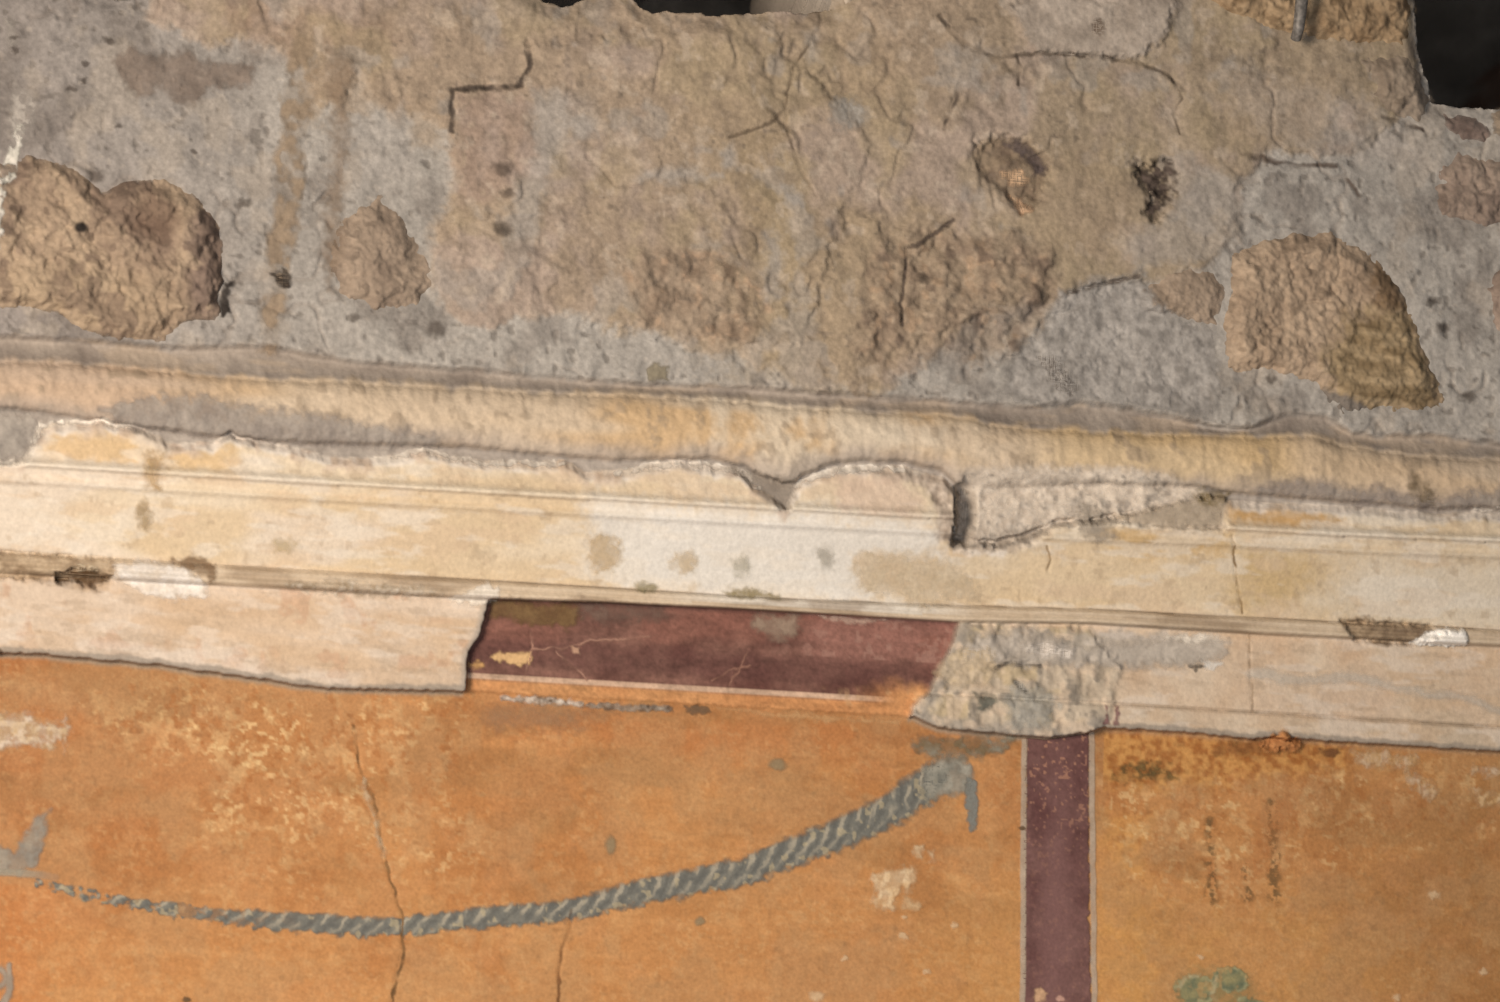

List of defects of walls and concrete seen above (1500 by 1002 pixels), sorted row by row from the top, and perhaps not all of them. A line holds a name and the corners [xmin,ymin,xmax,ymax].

crack [449,54,532,133]
crack [1013,52,1173,85]
spalling [979,139,1045,215]
spalling [1133,160,1176,216]
crack [898,219,954,326]
spalling [0,413,40,458]
spalling [938,627,1228,685]
crack [385,861,405,1002]
crack [555,954,563,1002]